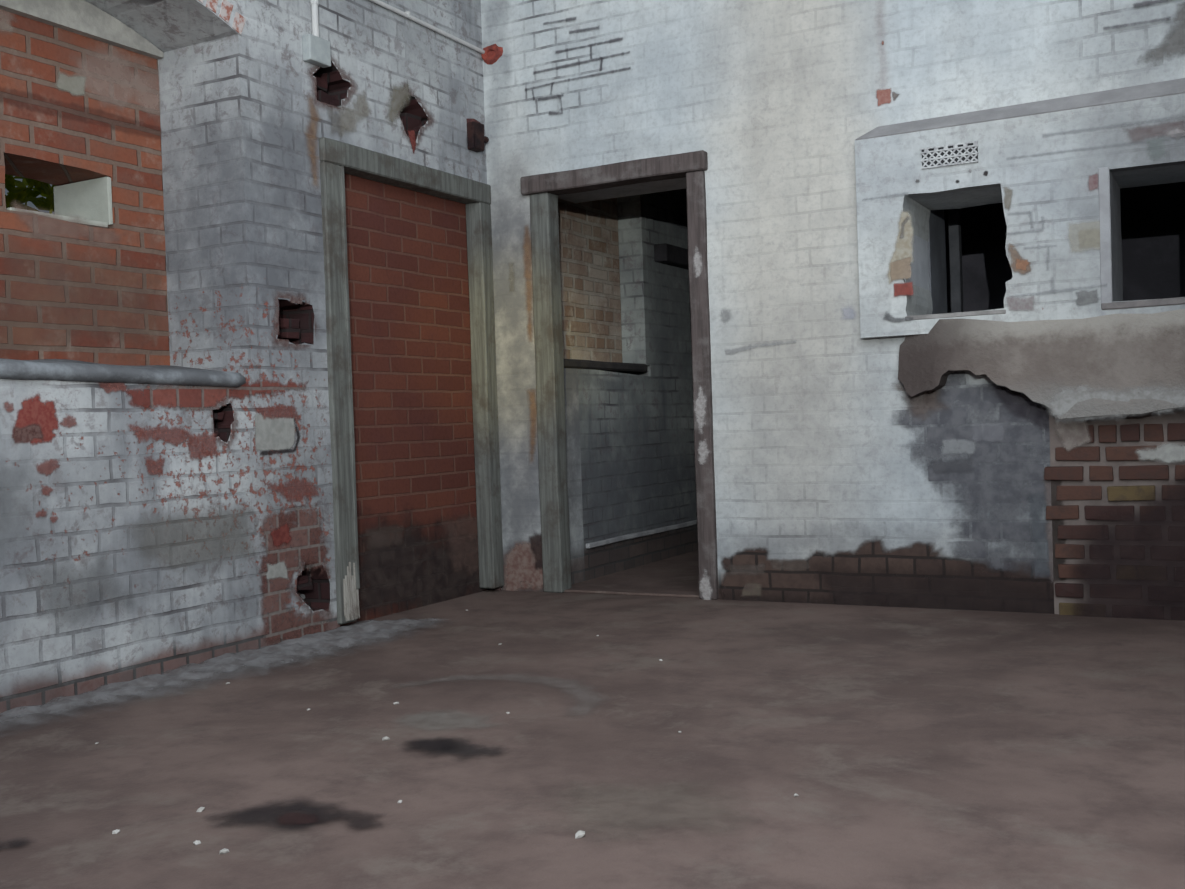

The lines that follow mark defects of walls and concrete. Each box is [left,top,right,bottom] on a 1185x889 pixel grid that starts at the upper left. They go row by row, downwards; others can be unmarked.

leakage [1146,2,1185,60]
spalling [310,58,356,110]
spalling [398,85,434,145]
spalling [888,212,913,296]
spalling [273,294,316,348]
spalling [884,313,913,322]
spalling [4,395,77,444]
flaking render [99,380,308,459]
peeling [695,387,709,464]
spalling [37,459,59,496]
flaking render [700,407,1185,621]
flaking render [260,477,331,642]